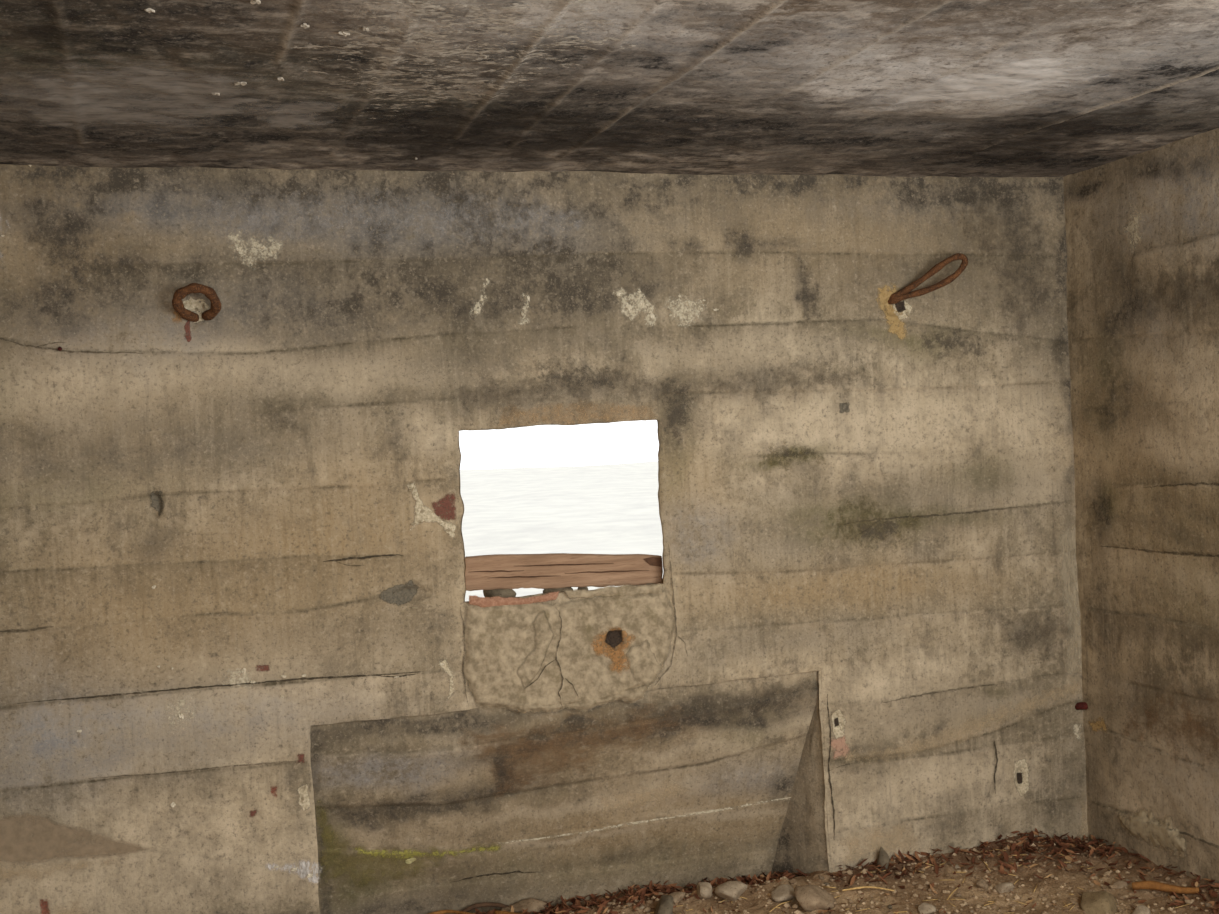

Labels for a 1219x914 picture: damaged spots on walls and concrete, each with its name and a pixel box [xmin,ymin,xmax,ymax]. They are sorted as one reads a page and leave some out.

leakage [1,0,636,129]
leakage [870,58,1103,108]
rust [174,311,192,342]
rust [877,285,906,339]
spalling [407,483,456,537]
crack [655,544,688,685]
crack [460,606,468,703]
crack [526,612,578,708]
rust [591,628,632,672]